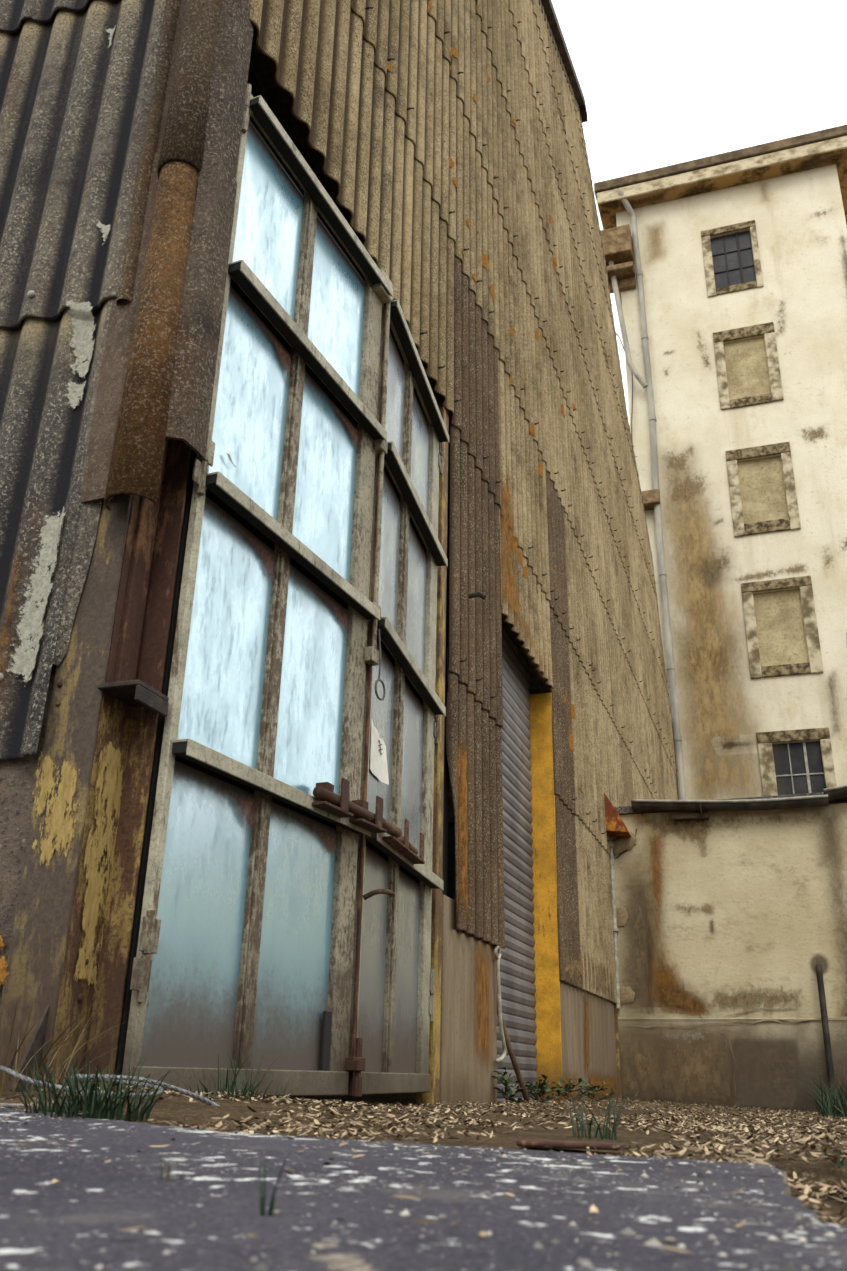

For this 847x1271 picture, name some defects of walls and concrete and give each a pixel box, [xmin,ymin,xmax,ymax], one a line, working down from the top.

peeling [65,381,86,409]
leakage [667,449,756,800]
leakage [735,565,804,581]
peeling [31,742,123,990]
leakage [627,864,672,1013]
leakage [679,903,714,932]
corrosion [476,950,490,1056]